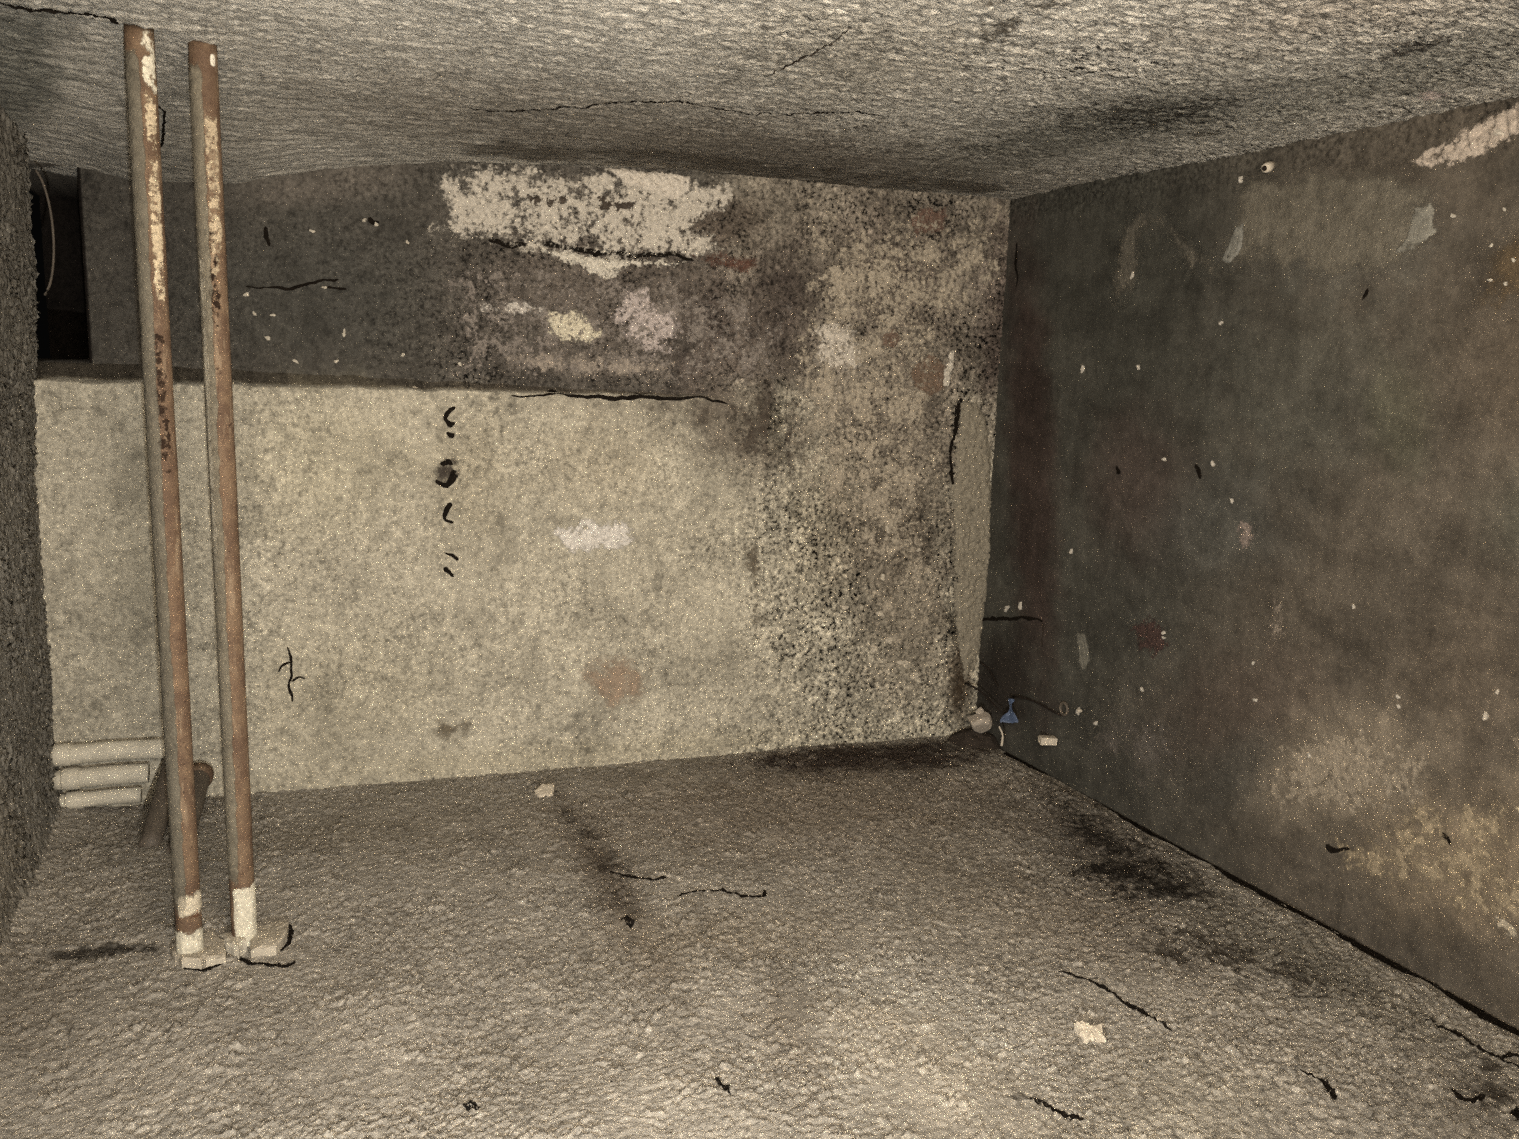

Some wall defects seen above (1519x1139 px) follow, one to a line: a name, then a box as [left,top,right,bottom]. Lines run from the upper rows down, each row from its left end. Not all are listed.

spalling [1413,103,1519,168]
damp [812,319,862,377]
crack [511,389,728,404]
spalling [437,196,1010,688]
crack [949,398,963,485]
damp [747,546,759,575]
crack [1004,752,1519,1068]
crack [1299,1068,1337,1100]
crack [1451,1088,1486,1103]